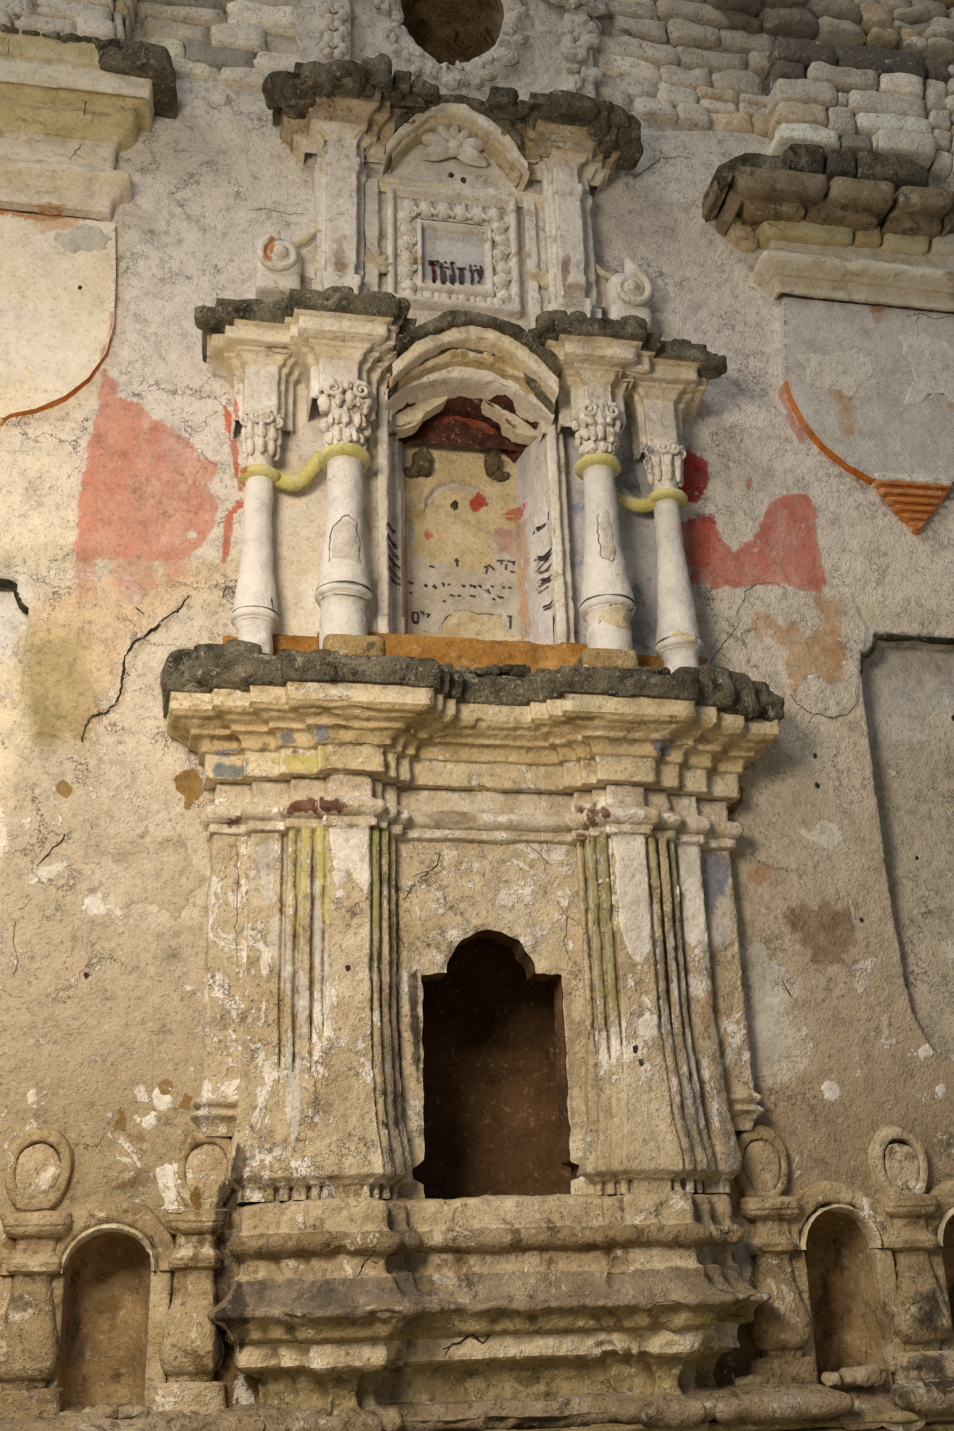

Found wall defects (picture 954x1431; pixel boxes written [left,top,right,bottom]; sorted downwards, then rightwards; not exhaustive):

flaking render [798,348,878,399]
flaking render [899,335,954,411]
crack [81,586,235,742]
peeling [273,723,329,777]
flaking render [256,823,397,1146]
spalling [134,1087,173,1130]
spalling [155,1161,183,1212]
crack [443,1334,490,1358]